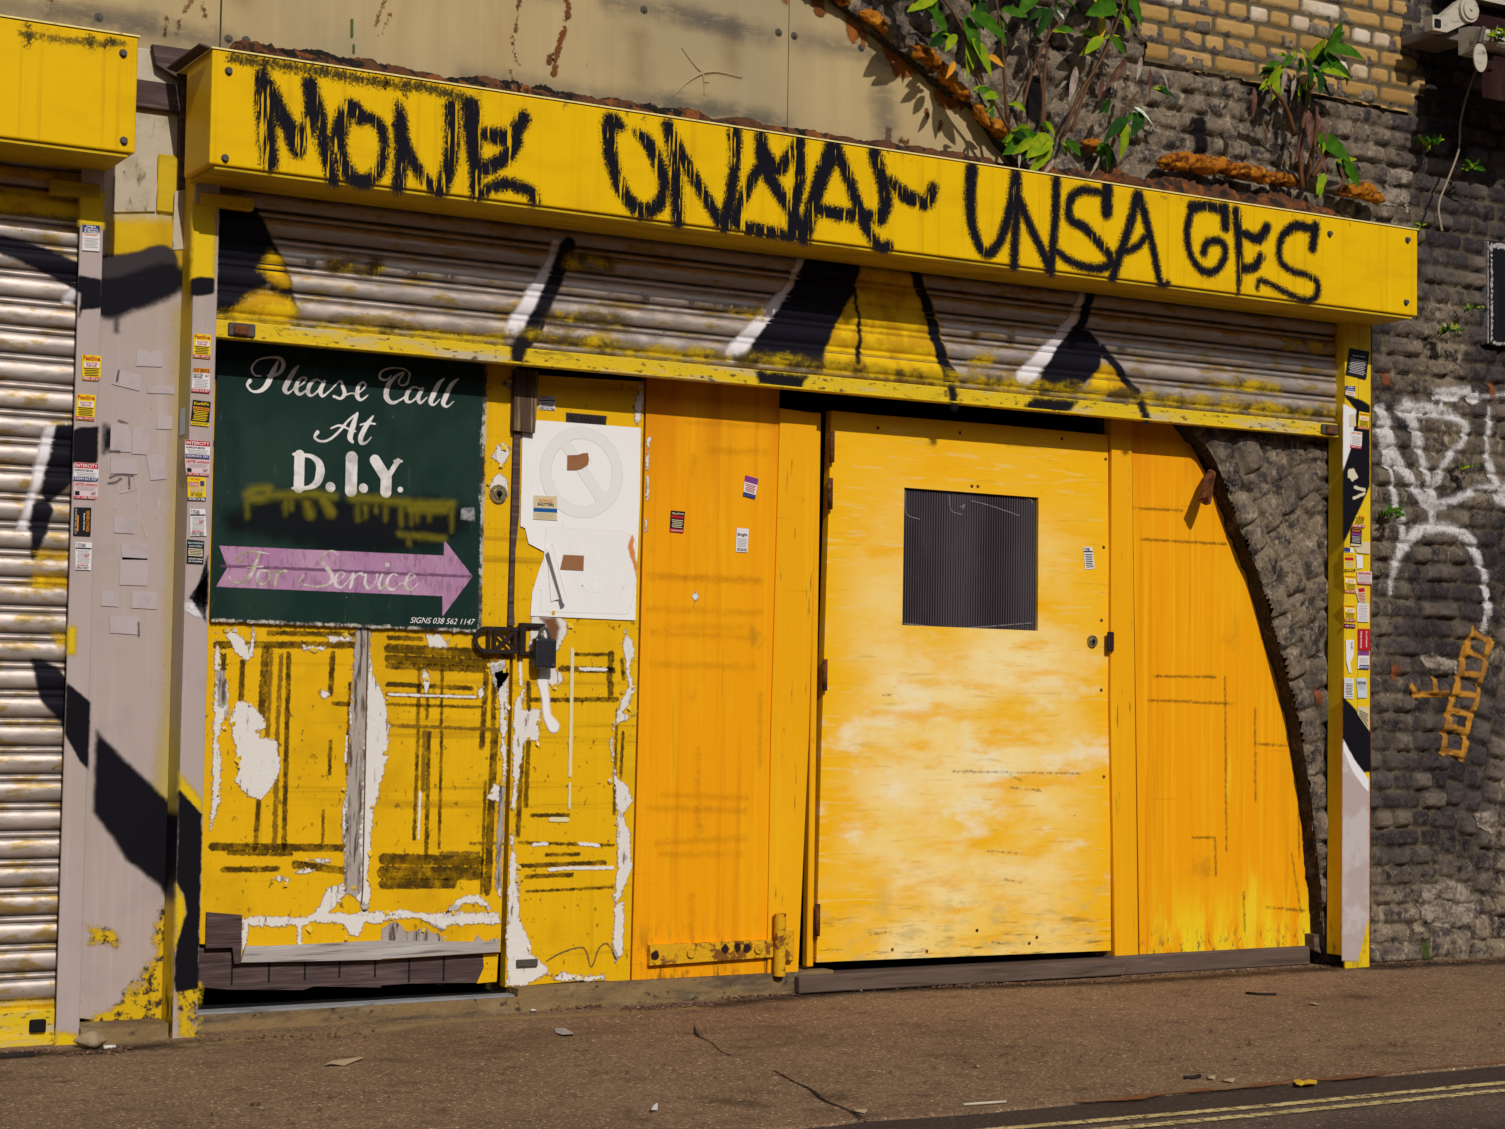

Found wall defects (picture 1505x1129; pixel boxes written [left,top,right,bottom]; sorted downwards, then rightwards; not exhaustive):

corrosion [547,0,572,77]
peeling [209,625,281,831]
peeling [242,611,638,986]
crack [693,1025,730,1055]
crack [774,1070,869,1120]